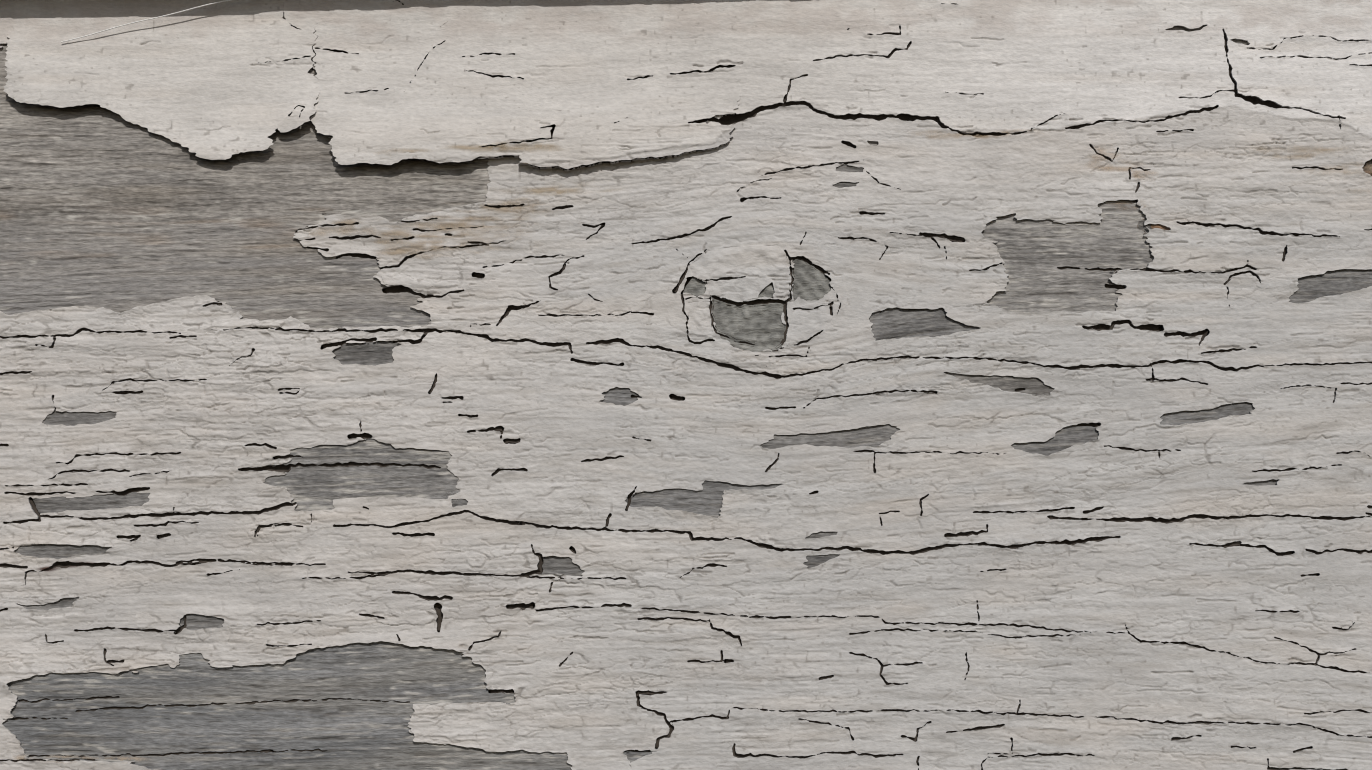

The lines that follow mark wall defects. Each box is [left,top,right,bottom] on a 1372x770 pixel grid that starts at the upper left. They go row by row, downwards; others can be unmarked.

peeling [0,13,741,366]
crack [0,27,1372,411]
peeling [869,308,980,341]
peeling [981,200,1170,313]
peeling [1289,269,1372,303]
peeling [257,438,468,511]
crack [429,374,527,475]
peeling [625,481,783,518]
peeling [760,424,900,452]
peeling [178,614,224,630]
crack [0,422,1372,770]
peeling [3,634,672,770]